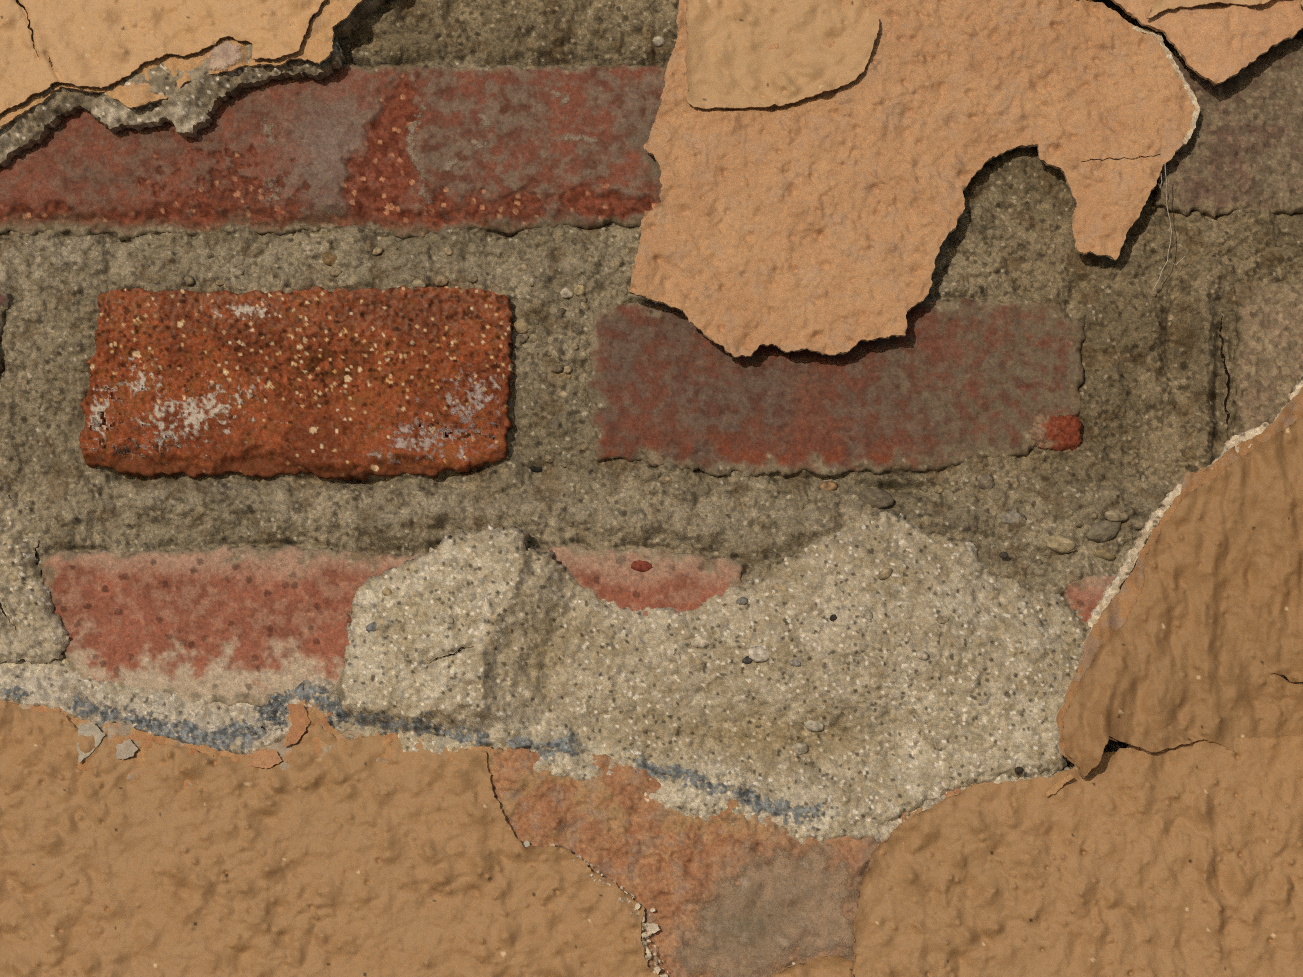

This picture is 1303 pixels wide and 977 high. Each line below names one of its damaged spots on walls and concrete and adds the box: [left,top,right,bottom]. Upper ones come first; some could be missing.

crack [16,0,53,70]
peeling [209,41,243,70]
peeling [629,0,1303,358]
water stain [201,299,270,320]
water stain [88,356,254,457]
water stain [367,364,501,464]
flaking render [0,511,1090,977]